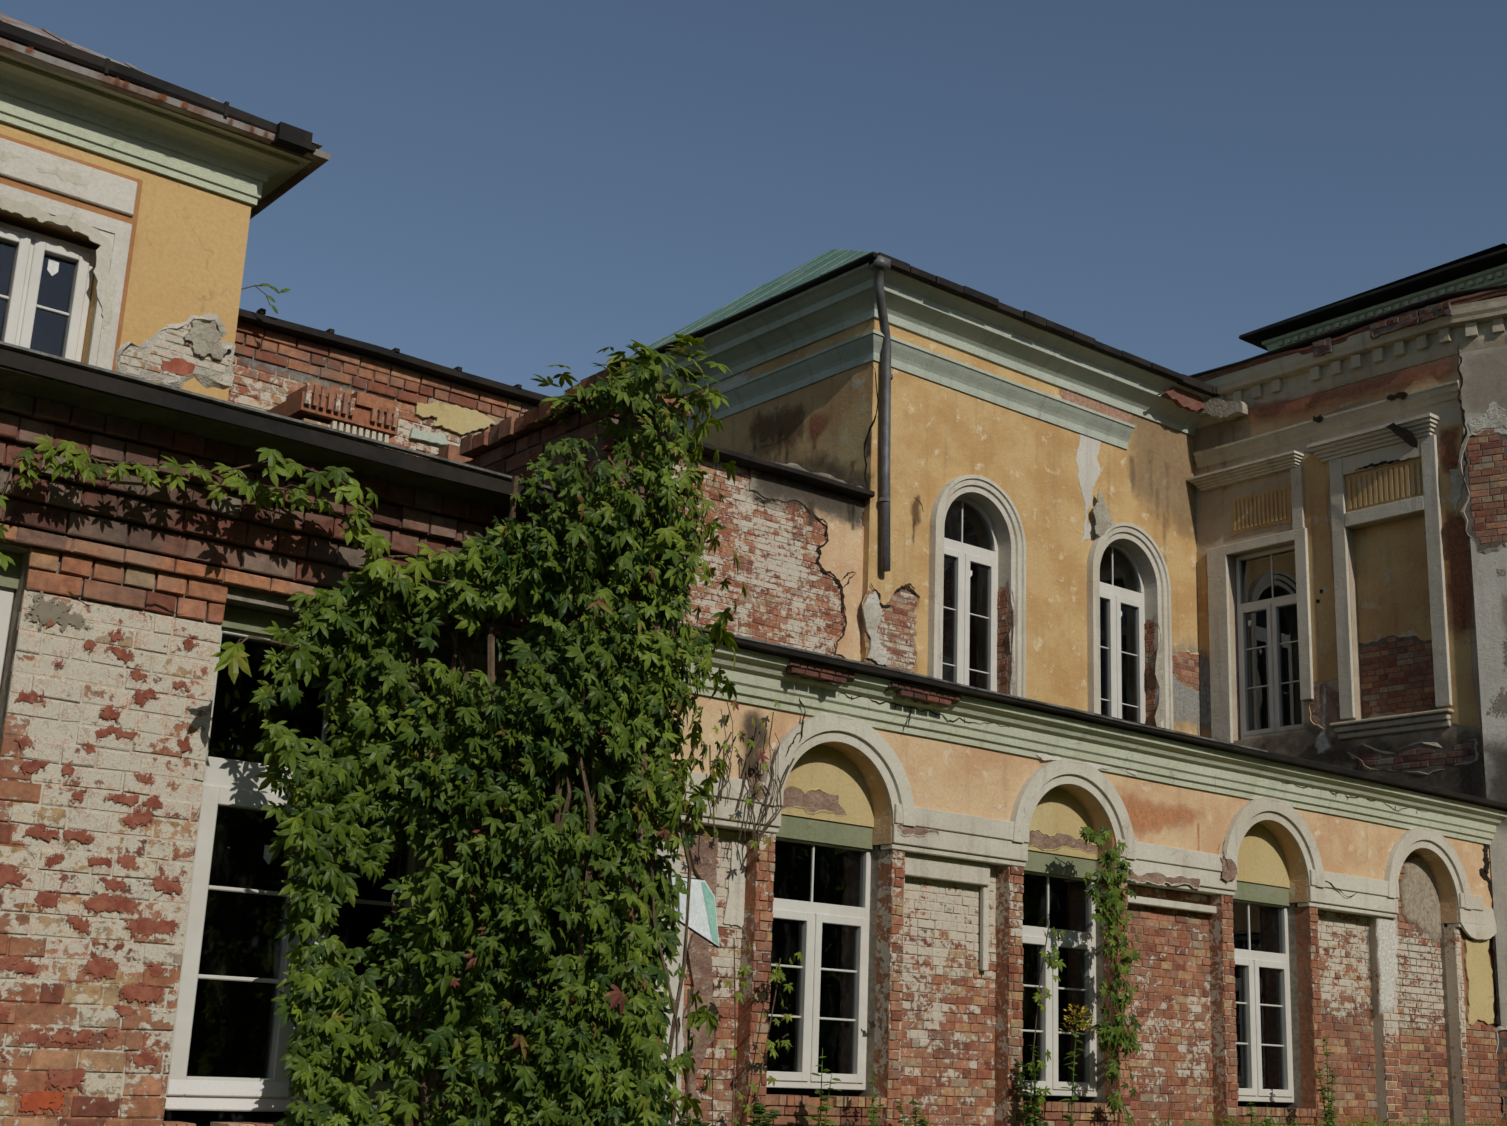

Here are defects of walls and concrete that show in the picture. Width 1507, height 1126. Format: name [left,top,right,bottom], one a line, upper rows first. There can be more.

spalling [115,312,236,389]
crack [1457,345,1468,496]
spalling [1439,429,1507,629]
peeling [14,588,193,830]
spalling [783,587,961,706]
spalling [986,580,1016,696]
spalling [1309,681,1343,730]
spalling [1359,633,1438,719]
peeling [0,823,185,939]
peeling [0,957,165,1062]
spalling [18,1066,86,1114]
spalling [1494,1025,1507,1126]